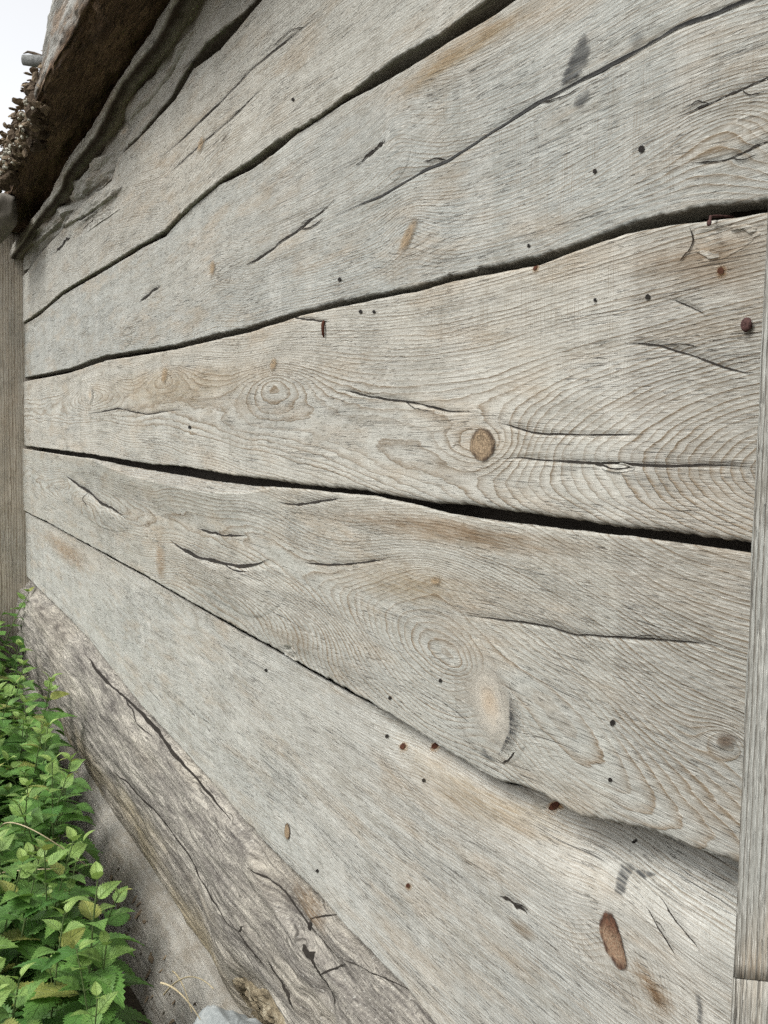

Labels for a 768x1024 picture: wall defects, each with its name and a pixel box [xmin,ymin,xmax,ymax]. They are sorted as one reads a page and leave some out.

crack [248,0,752,264]
crack [634,343,756,374]
crack [495,421,756,470]
crack [68,477,124,517]
crack [170,528,268,572]
crack [85,654,231,820]
crack [250,869,409,1009]